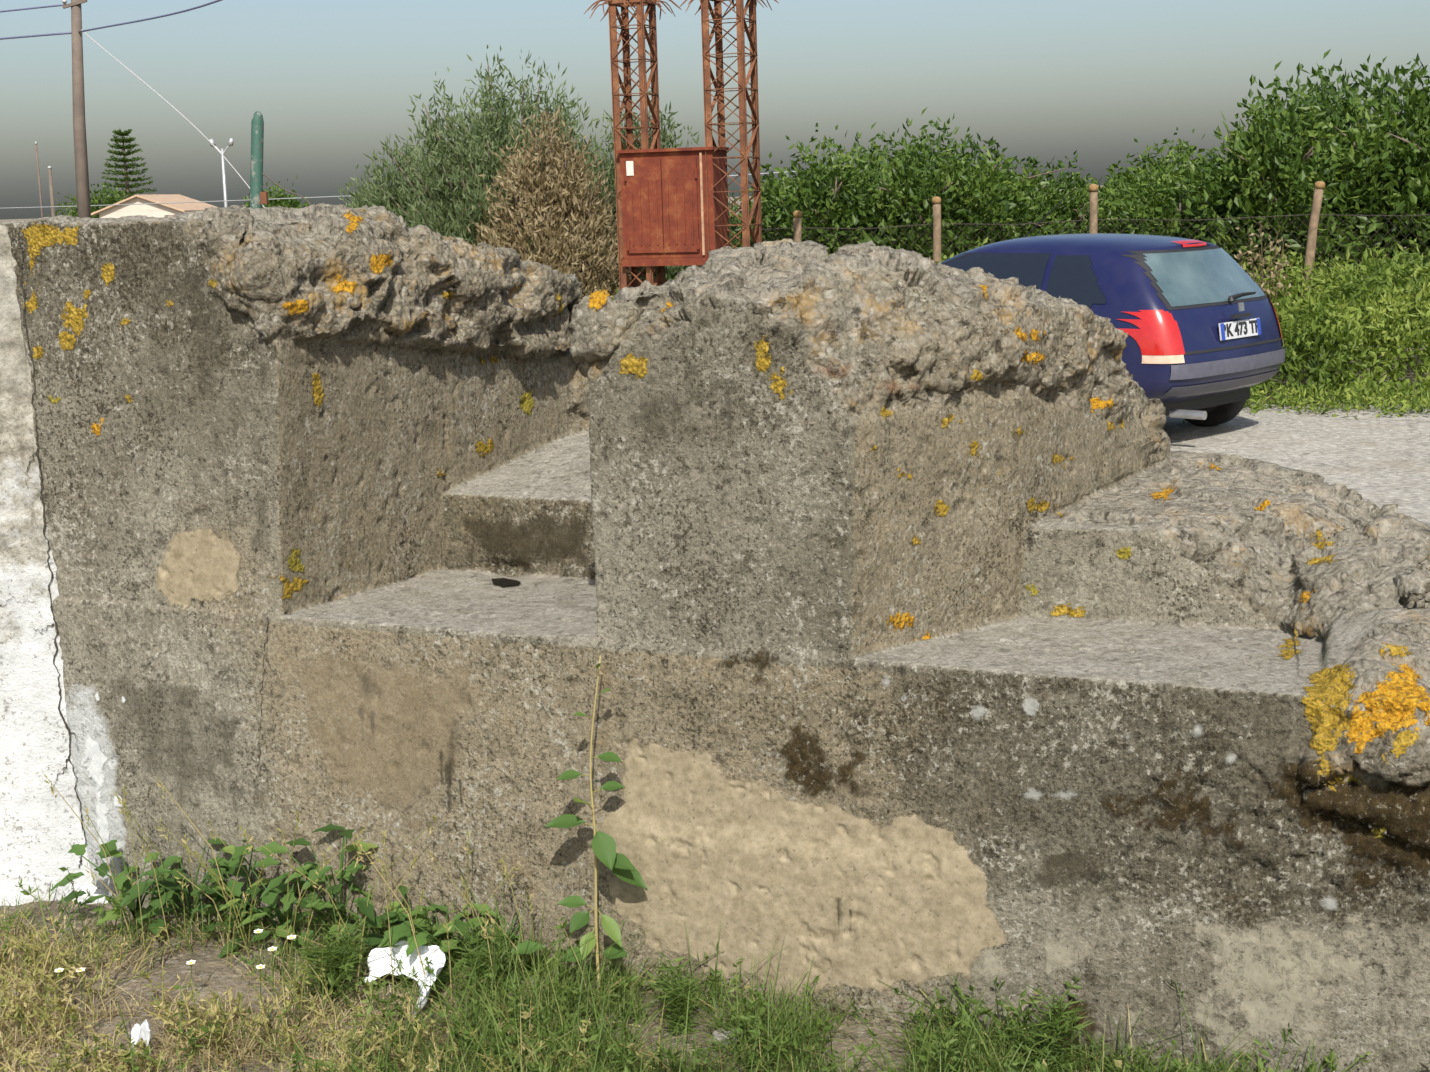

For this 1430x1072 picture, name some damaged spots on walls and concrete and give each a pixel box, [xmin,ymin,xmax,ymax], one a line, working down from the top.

spalling [1,203,542,344]
crack [0,233,86,868]
peeling [155,528,241,610]
spalling [468,239,1430,801]
peeling [80,733,122,845]
peeling [596,734,1006,997]